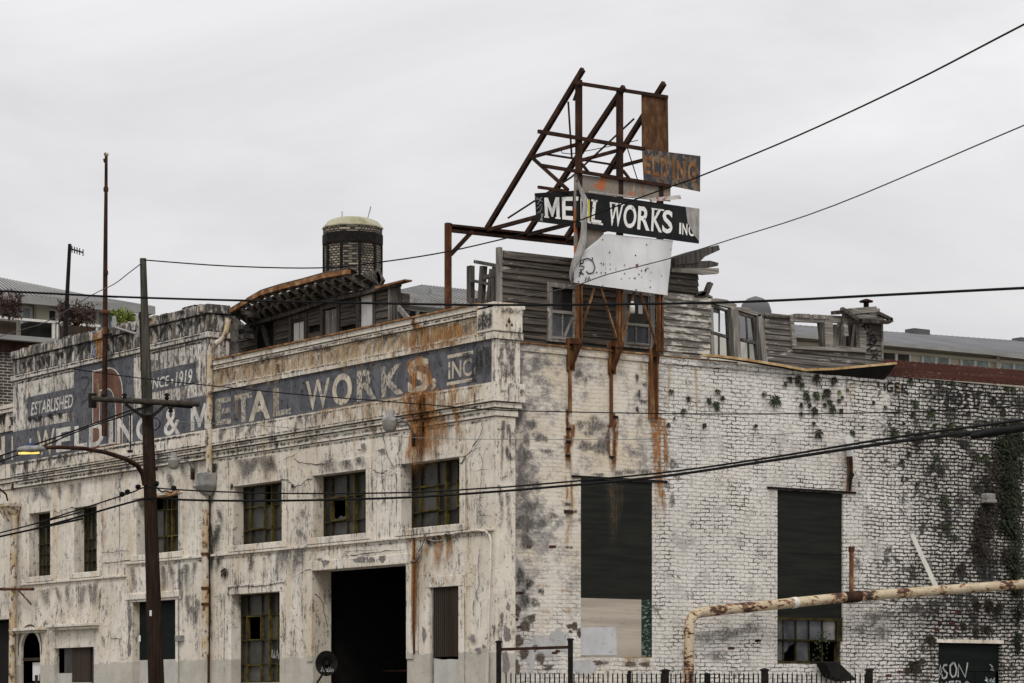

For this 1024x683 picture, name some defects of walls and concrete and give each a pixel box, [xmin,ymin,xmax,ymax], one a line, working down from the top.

rust [212,306,479,461]
rust [564,409,575,462]
rust [607,413,619,467]
rust [652,417,668,505]
peeling [351,555,386,563]
water stain [950,464,1008,585]
peeling [499,591,560,675]
water stain [960,596,1004,633]